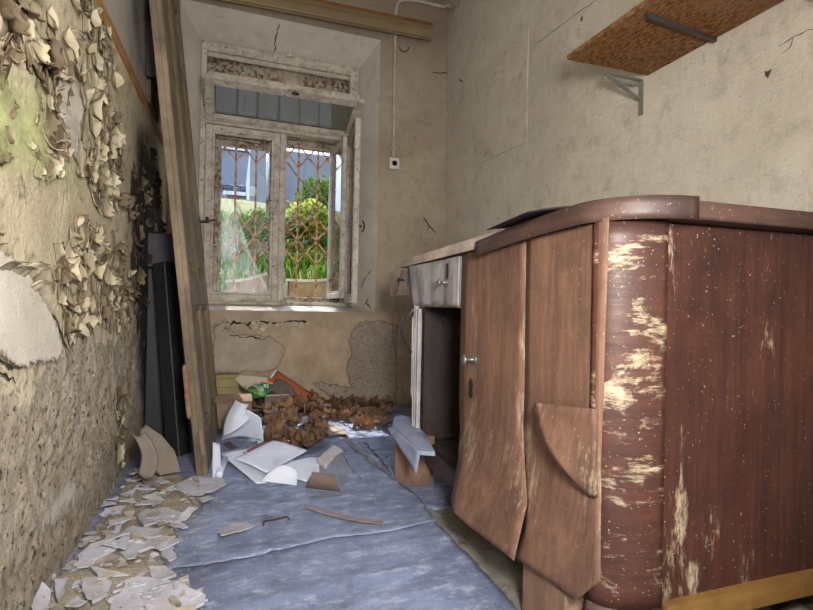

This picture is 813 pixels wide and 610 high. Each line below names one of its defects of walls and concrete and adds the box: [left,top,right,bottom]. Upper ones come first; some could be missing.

flaking render [212,318,310,373]
flaking render [314,320,398,406]